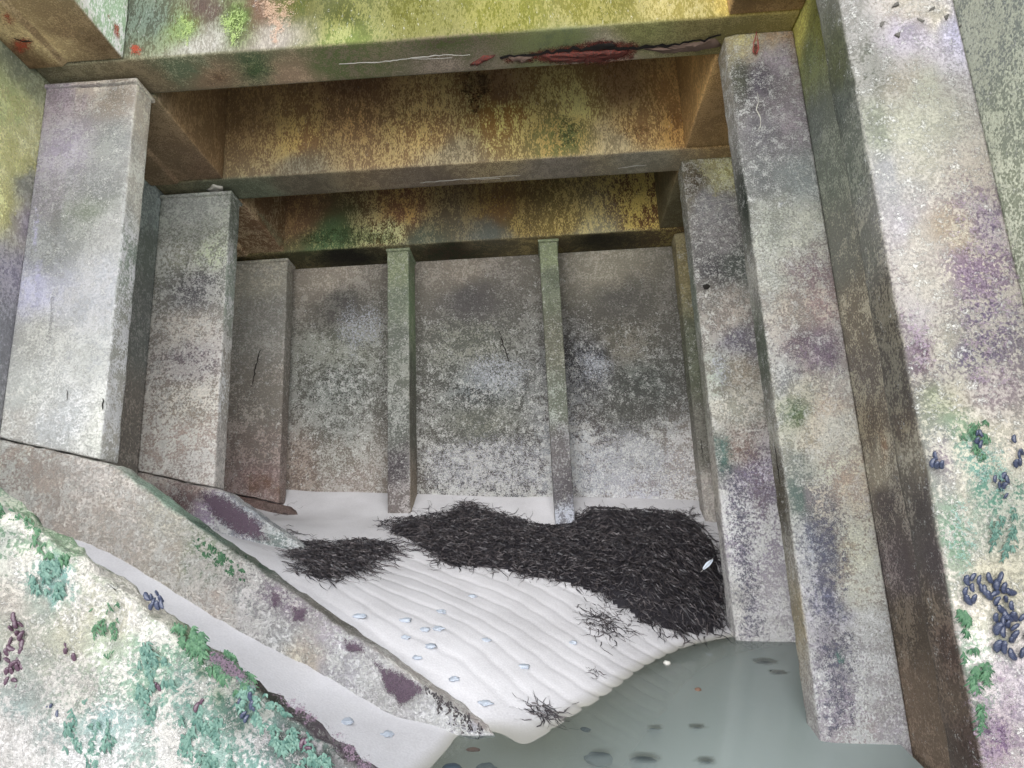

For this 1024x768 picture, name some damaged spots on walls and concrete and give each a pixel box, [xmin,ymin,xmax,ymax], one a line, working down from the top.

crack [344,34,722,66]